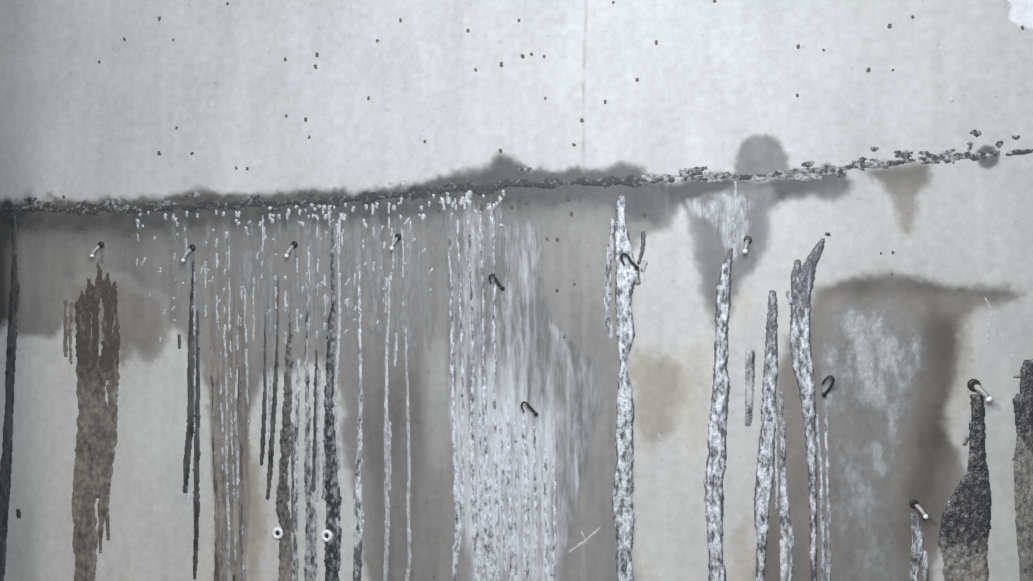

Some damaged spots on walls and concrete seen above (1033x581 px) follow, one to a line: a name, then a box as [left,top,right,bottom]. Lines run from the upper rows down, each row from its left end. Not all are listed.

damp [0,134,853,581]
damp [744,232,1024,581]
damp [866,162,934,236]
damp [977,145,999,169]